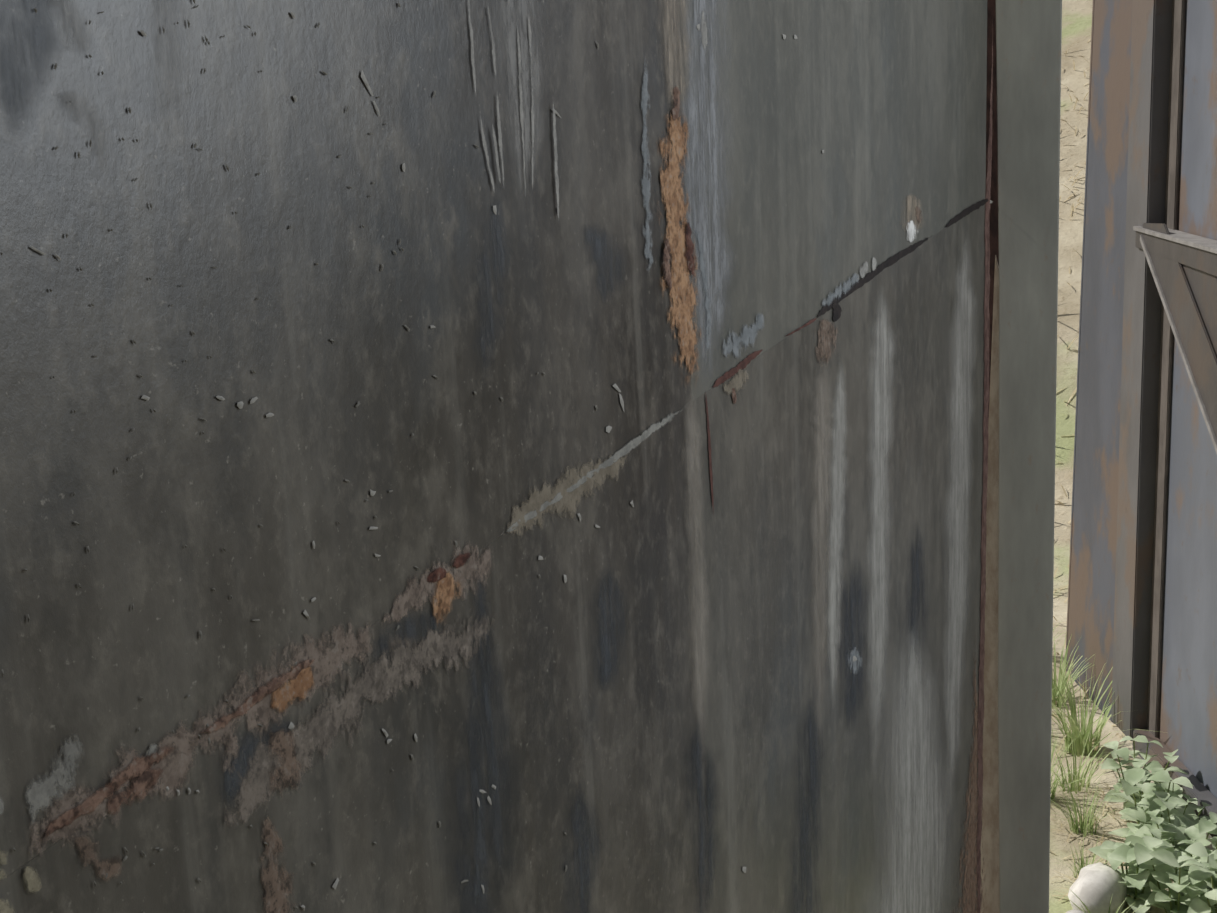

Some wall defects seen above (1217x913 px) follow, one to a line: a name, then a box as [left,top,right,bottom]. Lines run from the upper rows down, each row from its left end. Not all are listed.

corrosion [659,0,701,379]
crack [705,199,988,514]
corrosion [815,378,828,658]
peeling [24,867,41,892]
peeling [26,739,82,819]